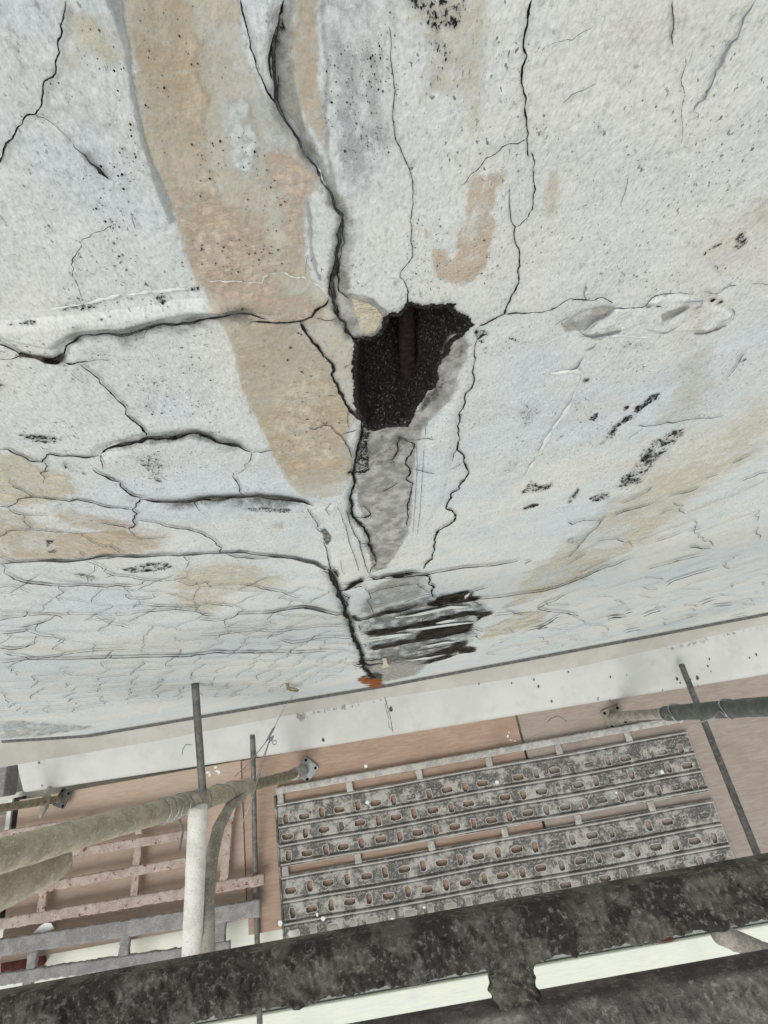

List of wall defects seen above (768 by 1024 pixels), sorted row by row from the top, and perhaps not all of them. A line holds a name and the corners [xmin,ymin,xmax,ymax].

water stain [67,0,388,498]
water stain [433,174,501,285]
crack [0,0,768,730]
spalling [351,299,475,431]
water stain [600,394,659,444]
water stain [480,420,768,640]
corrosion [357,677,385,688]
spalling [352,592,492,665]